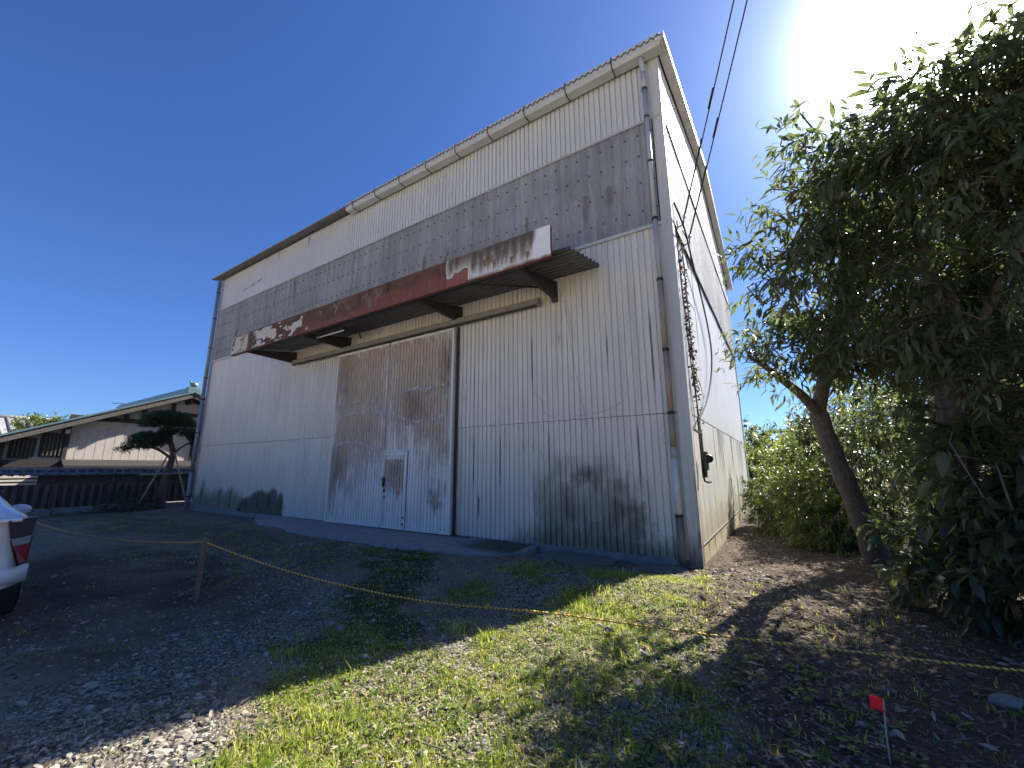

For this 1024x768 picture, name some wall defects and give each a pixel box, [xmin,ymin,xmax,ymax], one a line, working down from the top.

peeling [446,224,552,281]
corrosion [249,262,446,349]
peeling [230,316,308,355]